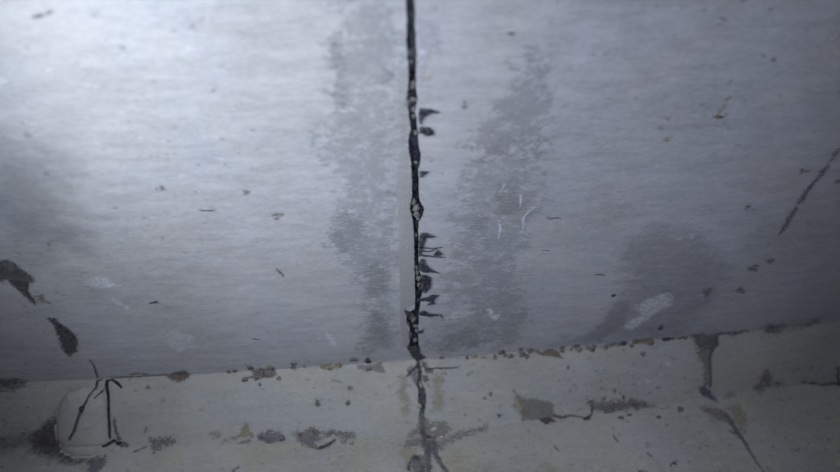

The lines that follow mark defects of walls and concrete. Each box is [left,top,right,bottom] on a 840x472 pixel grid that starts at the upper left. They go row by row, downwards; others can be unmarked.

crack [778,151,839,235]
crack [404,0,459,472]
spalling [0,259,48,306]
spalling [48,317,78,356]
crack [802,367,840,386]
spalling [513,390,556,425]
crack [701,407,764,472]